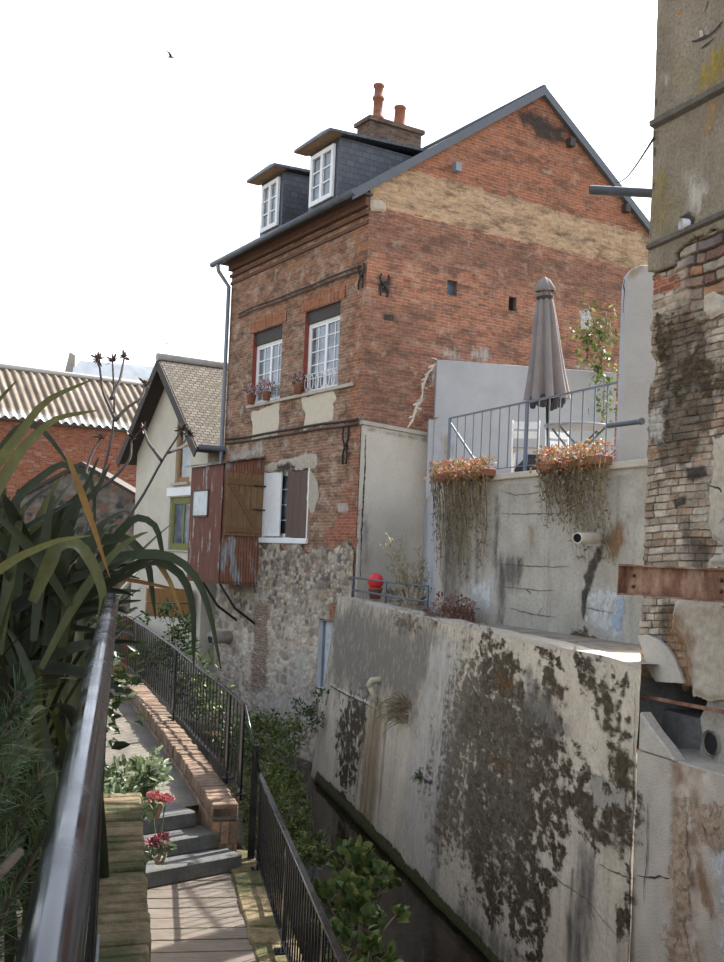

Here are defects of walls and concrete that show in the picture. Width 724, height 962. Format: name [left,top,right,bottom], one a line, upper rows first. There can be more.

spalling [652,274,681,295]
peeling [264,452,319,514]
peeling [686,435,724,568]
water stain [329,602,460,884]
water stain [487,870,518,936]
water stain [526,828,567,962]
crack [529,716,670,962]
water stain [615,863,634,942]